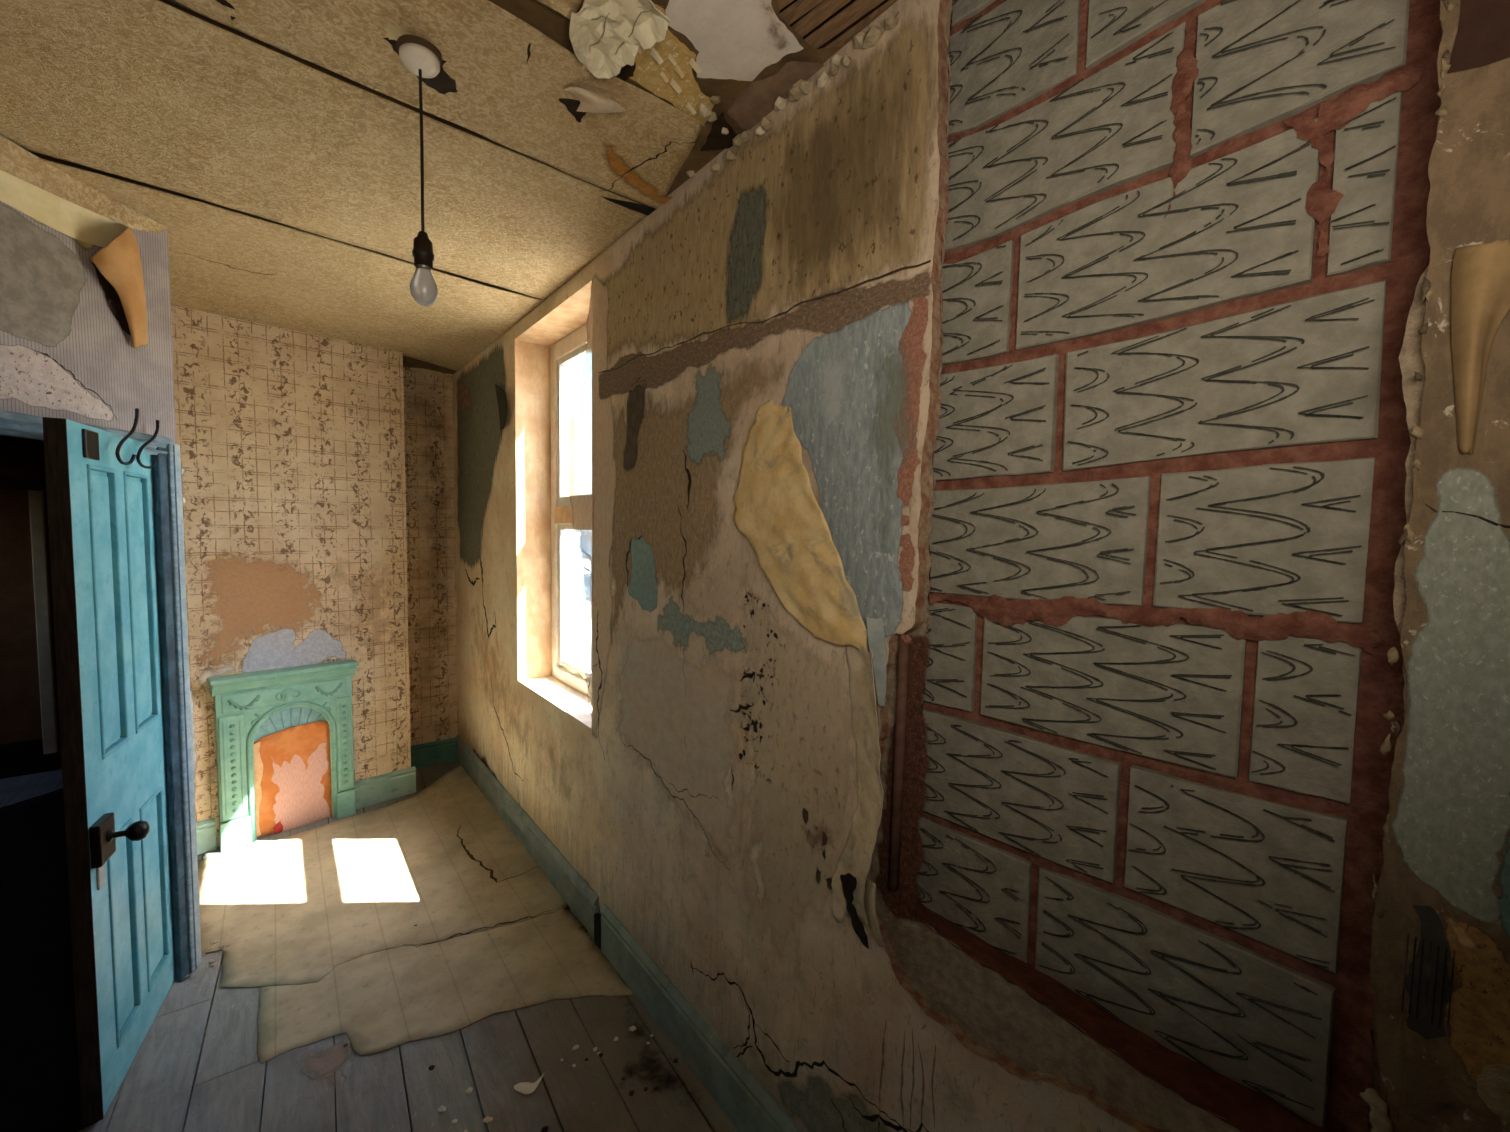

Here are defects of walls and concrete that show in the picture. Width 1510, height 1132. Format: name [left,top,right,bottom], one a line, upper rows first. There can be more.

peeling [559,87,628,123]
crack [605,137,701,191]
flaking render [665,0,825,151]
flaking render [1426,0,1458,226]
peeling [457,344,507,569]
flaking render [568,276,746,737]
flaking render [782,0,1336,1132]
flaking render [1380,245,1510,1125]
crack [690,959,929,1132]
flaking render [1360,859,1393,1132]